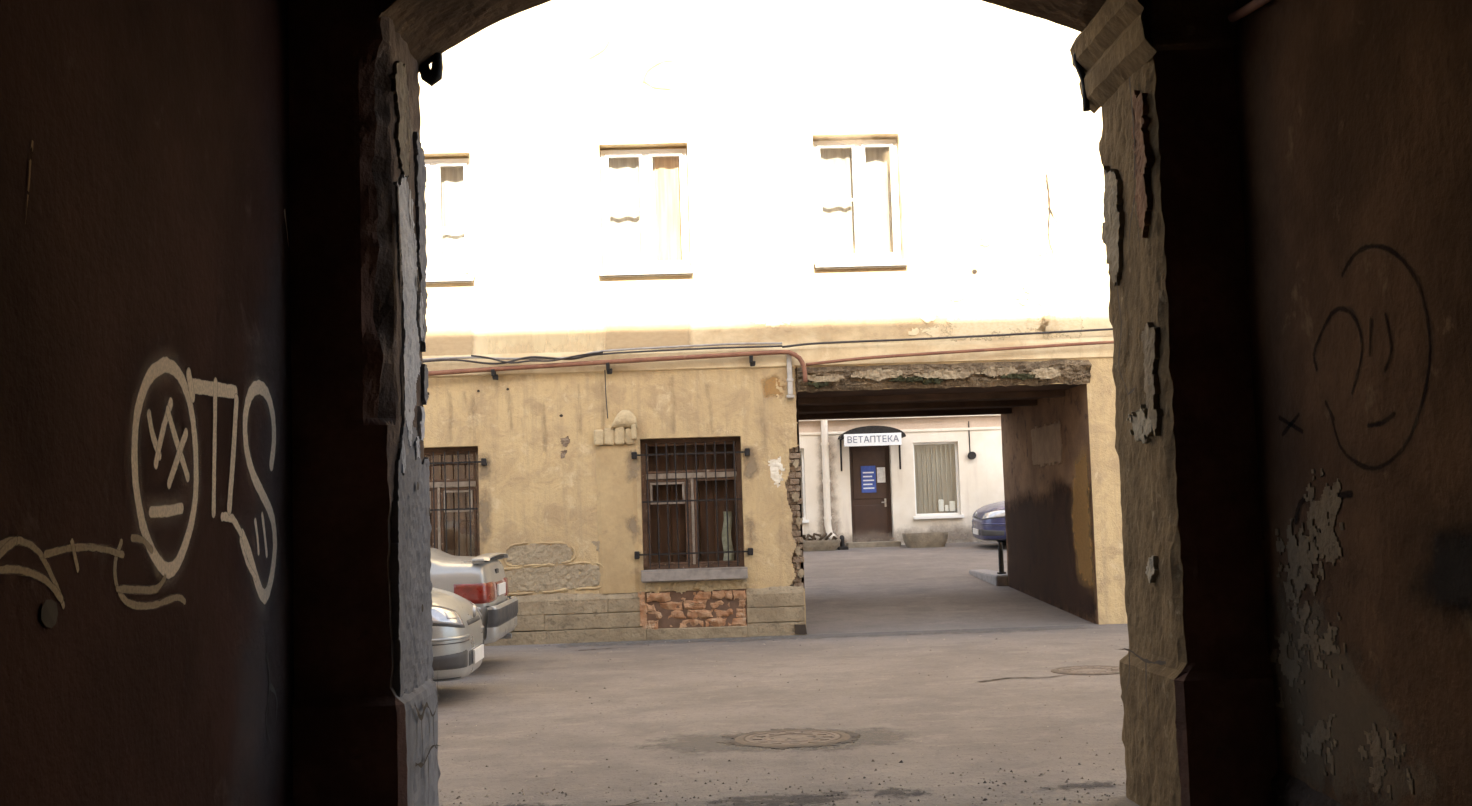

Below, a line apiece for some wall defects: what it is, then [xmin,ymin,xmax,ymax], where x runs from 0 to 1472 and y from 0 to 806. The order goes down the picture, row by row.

peeling [1102,90,1155,286]
peeling [738,300,807,328]
peeling [908,242,1085,341]
spalling [768,366,1062,587]
flaking render [638,579,749,629]
spalling [1270,468,1347,776]